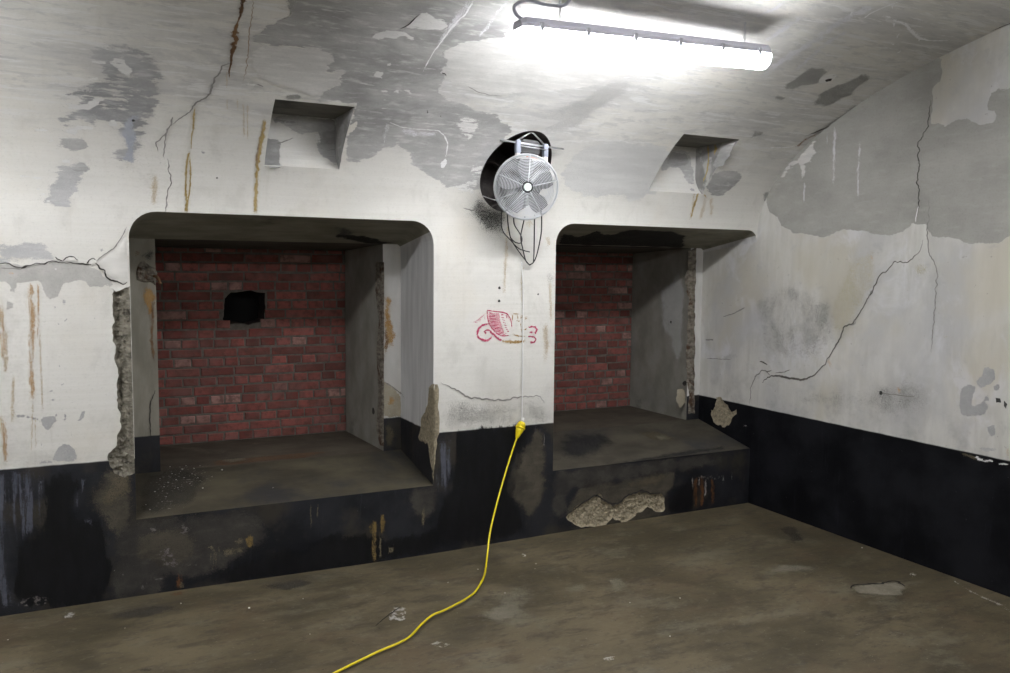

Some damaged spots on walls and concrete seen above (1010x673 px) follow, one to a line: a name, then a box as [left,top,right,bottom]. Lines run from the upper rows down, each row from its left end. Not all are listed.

peeling [43,44,164,207]
rust [184,109,195,214]
crack [149,0,263,211]
rust [226,99,266,213]
peeling [253,0,633,190]
crack [0,261,127,285]
crack [749,105,938,401]
rust [26,283,43,450]
flaking render [108,251,157,477]
crack [444,384,544,402]
leakage [13,469,113,609]
spalling [566,489,665,528]